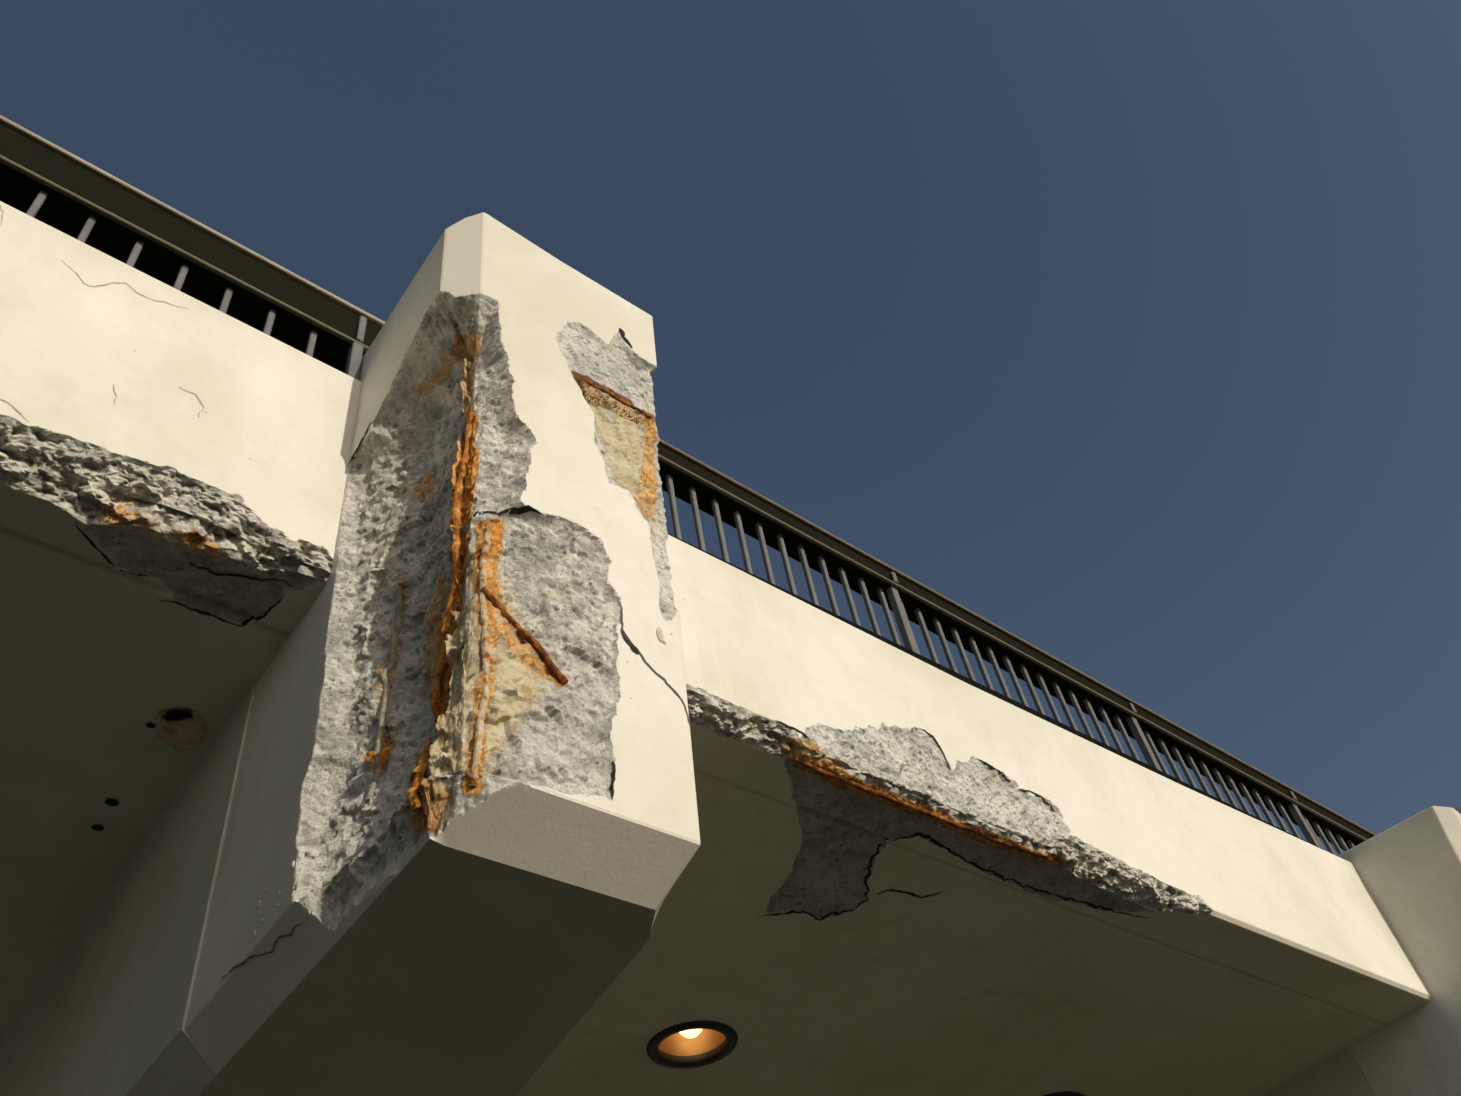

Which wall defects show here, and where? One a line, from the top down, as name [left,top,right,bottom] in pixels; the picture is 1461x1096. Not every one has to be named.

corrosion [105,500,221,559]
crack [75,521,294,627]
spalling [0,291,621,932]
corrosion [401,332,561,836]
corrosion [572,370,658,533]
spalling [554,322,678,621]
crack [617,598,691,728]
corrosion [363,726,394,775]
crack [777,720,820,749]
corrosion [778,737,1066,866]
peeling [686,684,1215,918]
crack [758,832,1144,921]